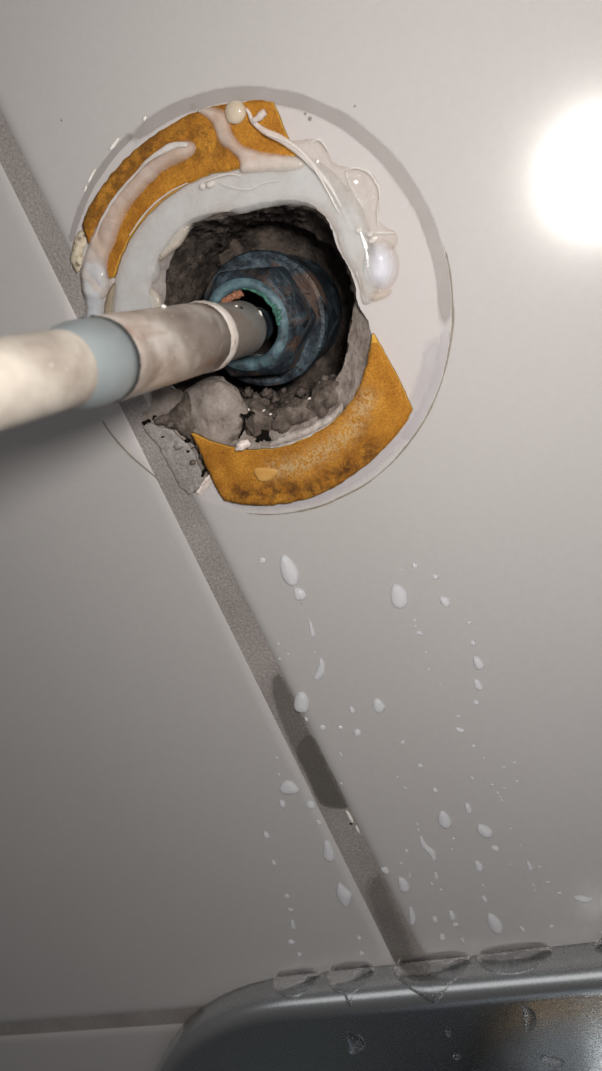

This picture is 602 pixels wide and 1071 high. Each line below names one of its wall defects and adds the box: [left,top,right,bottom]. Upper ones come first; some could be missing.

spalling [139,200,372,496]